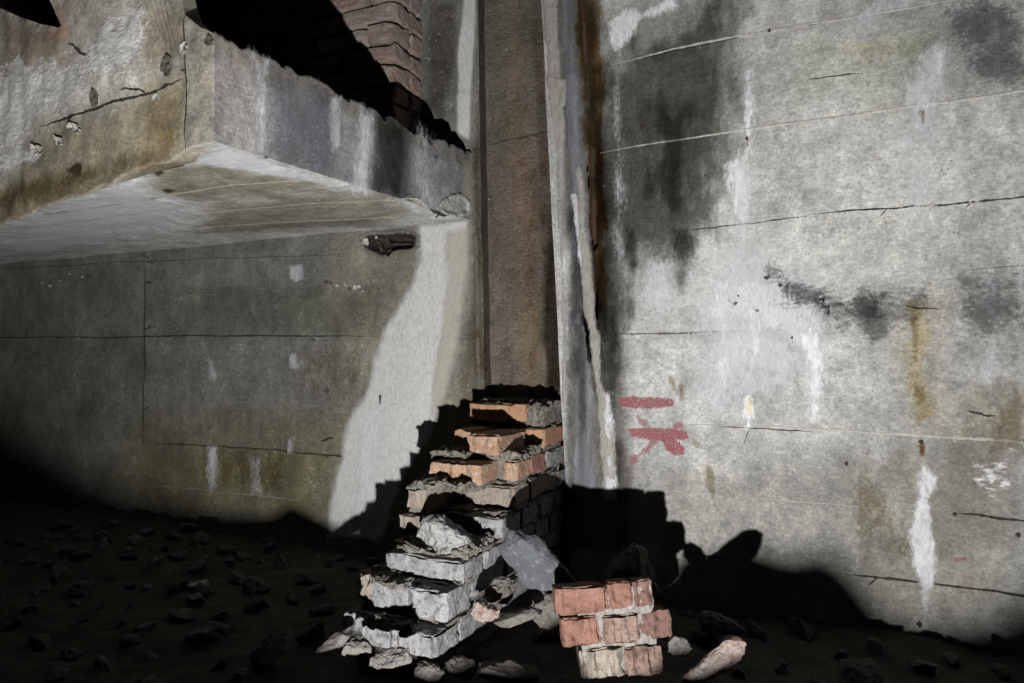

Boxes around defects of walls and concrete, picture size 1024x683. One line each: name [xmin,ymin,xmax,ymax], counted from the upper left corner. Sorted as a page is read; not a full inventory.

efflorescence [608,0,675,50]
peeling [0,6,149,171]
crack [41,15,187,150]
spalling [160,41,188,78]
water stain [201,146,308,179]
efflorescence [352,111,373,193]
efflorescence [724,70,755,240]
crack [694,196,1024,230]
hole [359,229,421,259]
crack [718,426,805,444]
efflorescence [910,466,937,606]
crack [849,574,1024,597]